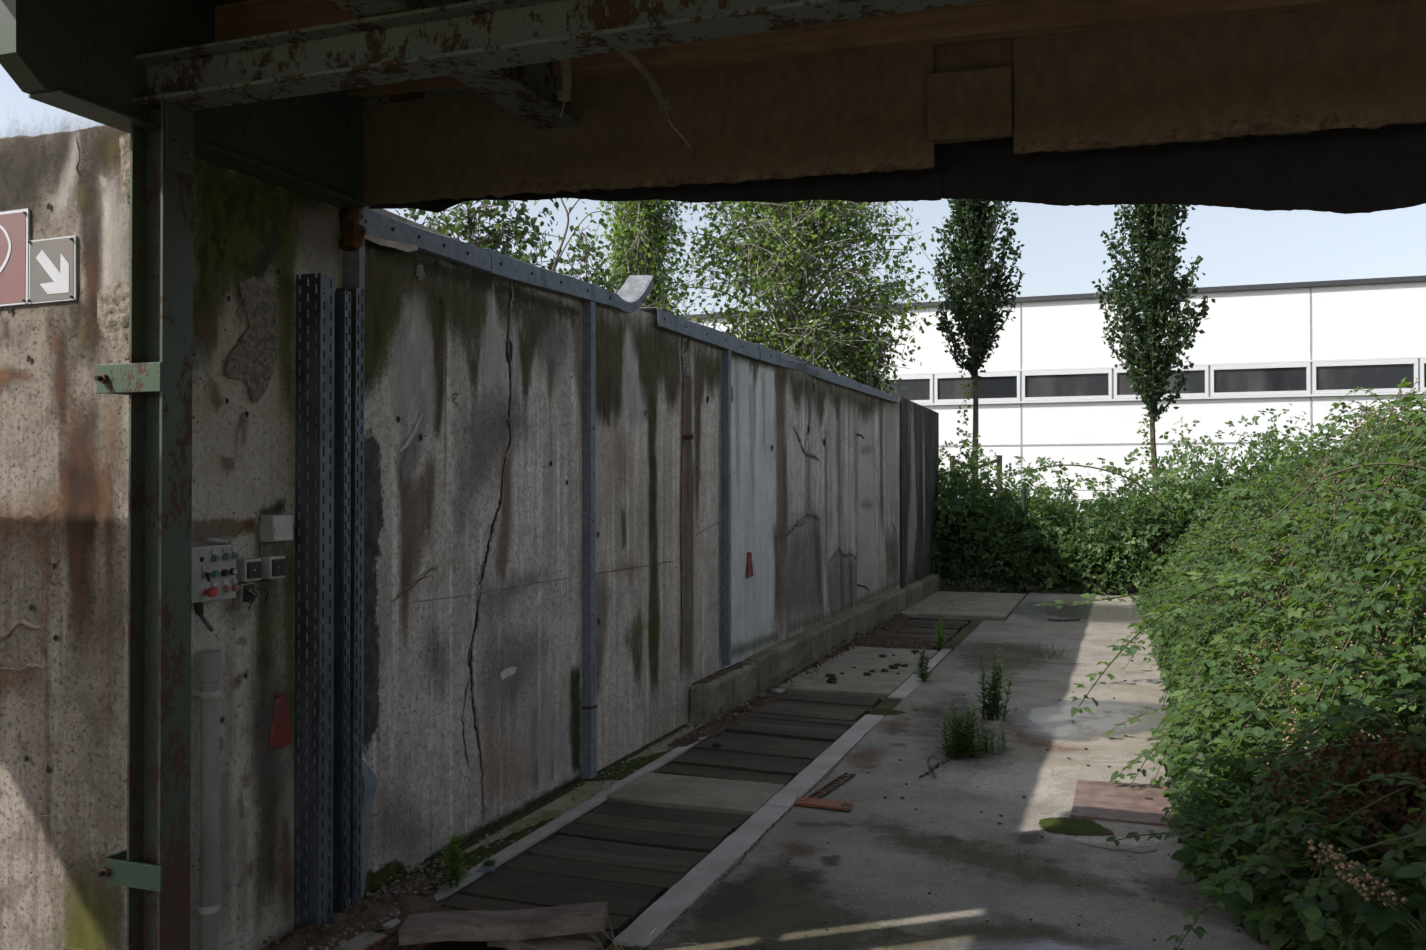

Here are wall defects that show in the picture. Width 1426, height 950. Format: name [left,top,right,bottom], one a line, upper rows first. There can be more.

crack [0,617,45,673]
leakage [362,535,381,755]
crack [391,564,439,604]
leakage [401,463,434,633]
leakage [395,302,444,432]
crack [462,282,515,827]
leakage [468,306,535,399]
leakage [497,463,510,576]
leakage [604,332,657,521]
leakage [720,363,788,620]
leakage [874,409,925,577]